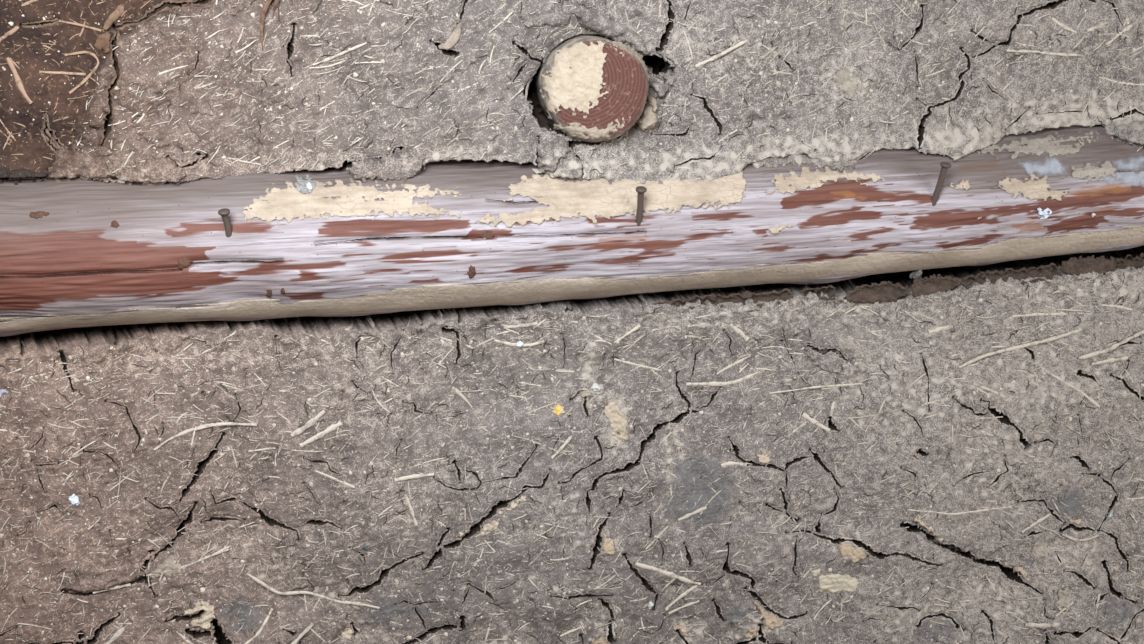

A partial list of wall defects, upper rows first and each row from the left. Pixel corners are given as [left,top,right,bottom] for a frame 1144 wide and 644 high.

spalling [94,32,111,53]
peeling [346,146,426,183]
crack [1082,272,1140,305]
crack [0,280,1144,644]